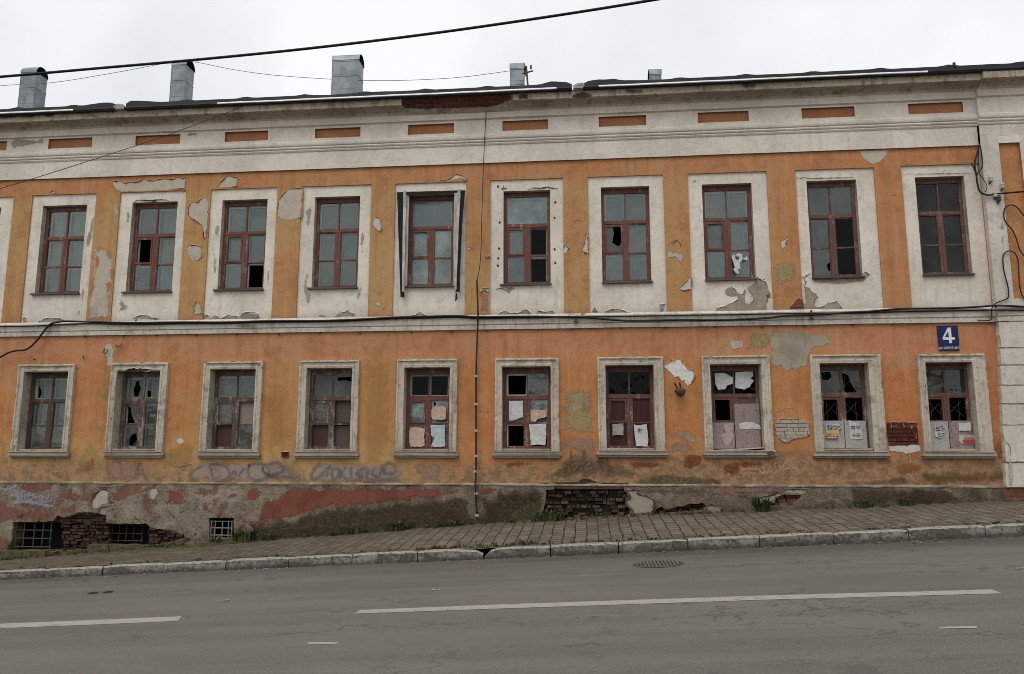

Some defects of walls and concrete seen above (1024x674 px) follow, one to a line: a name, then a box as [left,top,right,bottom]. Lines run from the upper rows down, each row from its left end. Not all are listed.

flaking render [402,94,511,109]
peeling [112,177,187,192]
peeling [187,198,219,273]
peeling [78,217,158,320]
peeling [715,262,870,311]
peeling [730,330,832,371]
flaking render [767,418,810,456]
flaking render [886,421,921,454]
spalling [15,487,114,551]
spalling [124,523,196,546]
water stain [251,497,471,538]
spalling [539,479,723,518]